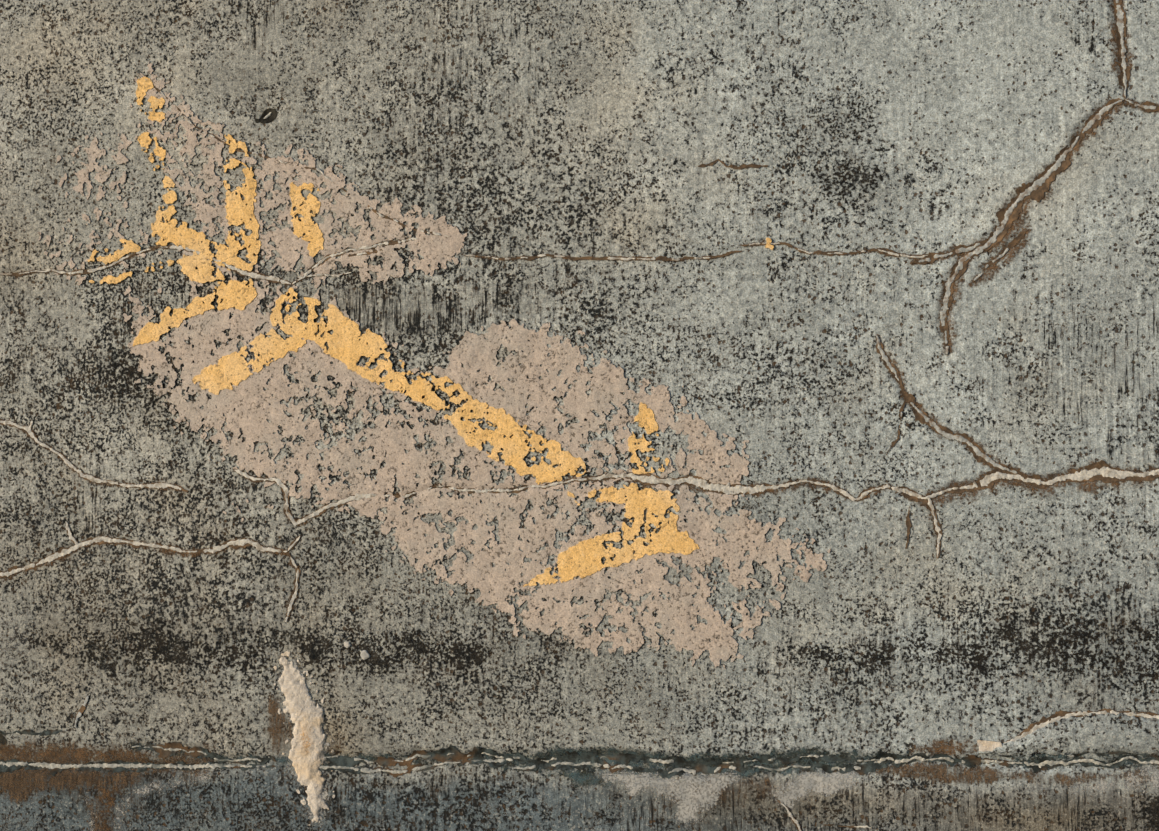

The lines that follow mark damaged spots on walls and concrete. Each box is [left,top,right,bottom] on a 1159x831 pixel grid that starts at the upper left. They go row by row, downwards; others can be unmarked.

crack [0,0,1159,355]
peeling [37,61,831,669]
crack [0,335,1159,622]
corrosion [0,742,212,831]
crack [0,696,276,776]
water stain [0,614,492,828]
water stain [602,770,740,826]
crack [319,745,1159,831]